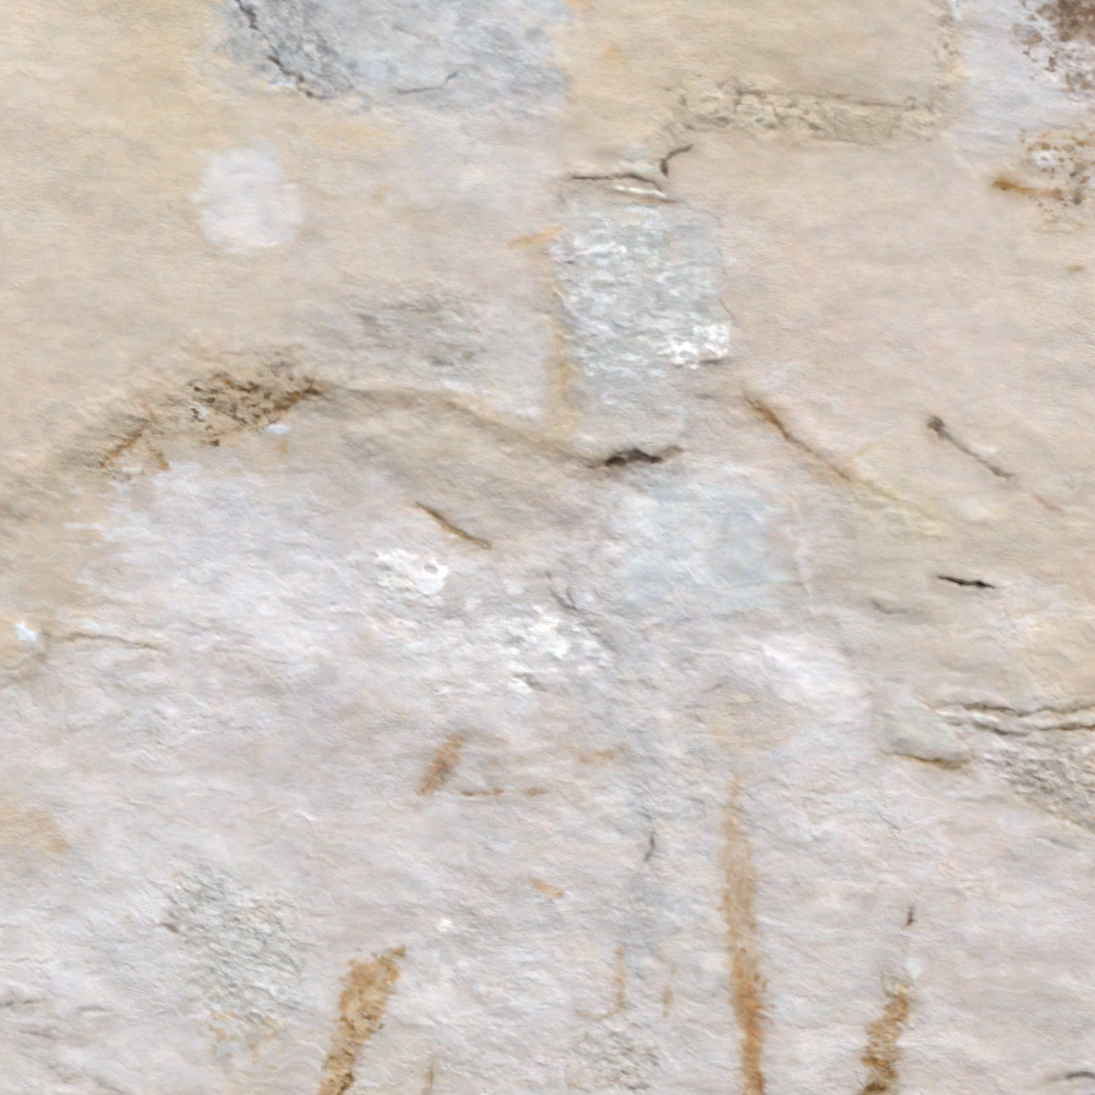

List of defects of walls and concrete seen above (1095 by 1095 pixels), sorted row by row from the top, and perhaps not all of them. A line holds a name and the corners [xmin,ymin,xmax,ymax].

peeling [181,0,754,440]
crack [557,82,723,207]
corrosion [77,329,340,502]
crack [574,443,693,484]
crack [923,413,1078,521]
crack [863,678,1095,776]
corrosion [685,685,806,1095]
corrosion [311,942,409,1095]
corrosion [851,899,928,1095]